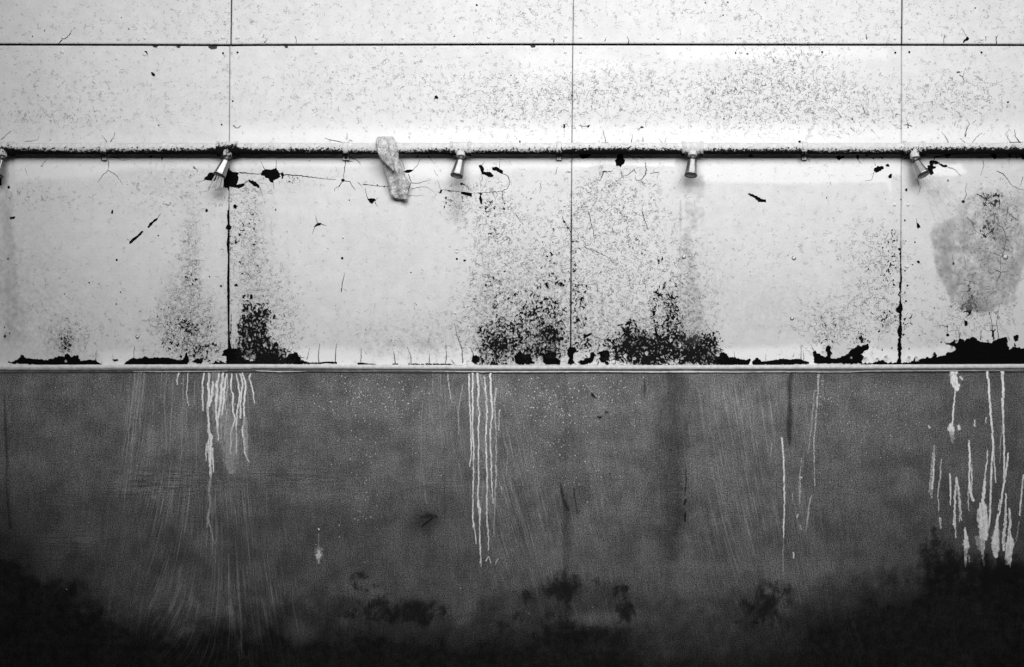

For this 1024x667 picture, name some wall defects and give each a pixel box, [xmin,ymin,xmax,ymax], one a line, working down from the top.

water stain [157,213,296,544]
water stain [448,240,724,567]
water stain [961,285,981,316]
mould [979,189,1003,244]